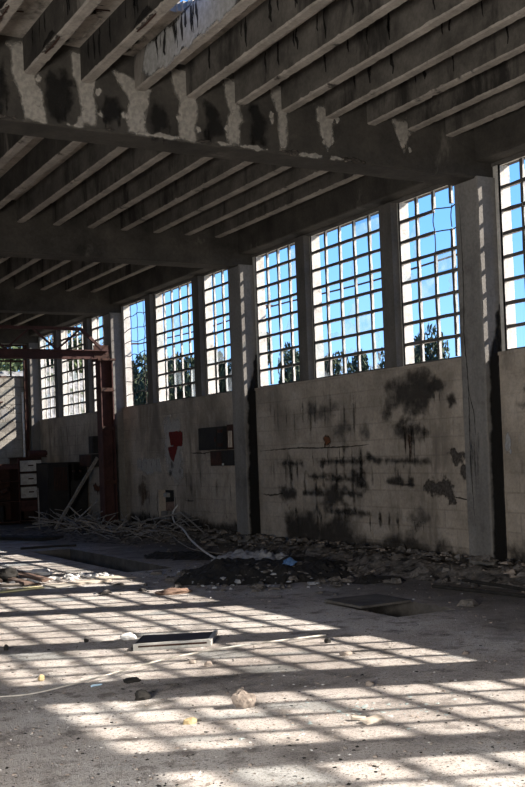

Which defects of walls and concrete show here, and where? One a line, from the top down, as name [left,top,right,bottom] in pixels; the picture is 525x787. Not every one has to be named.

damp [155,0,198,57]
peeling [0,42,47,124]
peeling [67,52,103,128]
peeling [113,0,268,152]
damp [247,355,469,566]